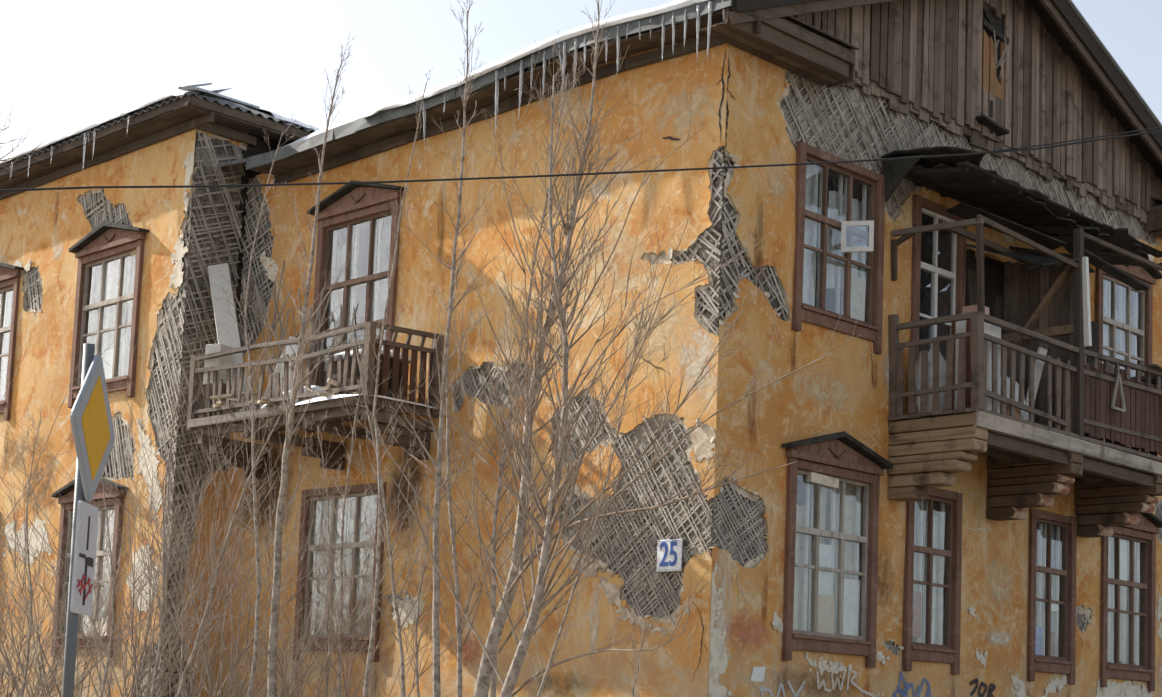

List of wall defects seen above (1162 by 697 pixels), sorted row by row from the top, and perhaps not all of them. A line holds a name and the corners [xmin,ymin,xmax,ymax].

crack [716,51,735,149]
flaking render [776,70,1159,261]
flaking render [77,188,133,230]
flaking render [640,145,790,336]
flaking render [0,259,43,315]
flaking render [102,129,279,697]
flaking render [450,357,546,413]
peeling [2,517,52,566]
flaking render [549,388,769,697]
flaking render [1154,499,1162,544]
peeling [1009,669,1069,697]
peeling [1095,679,1154,697]